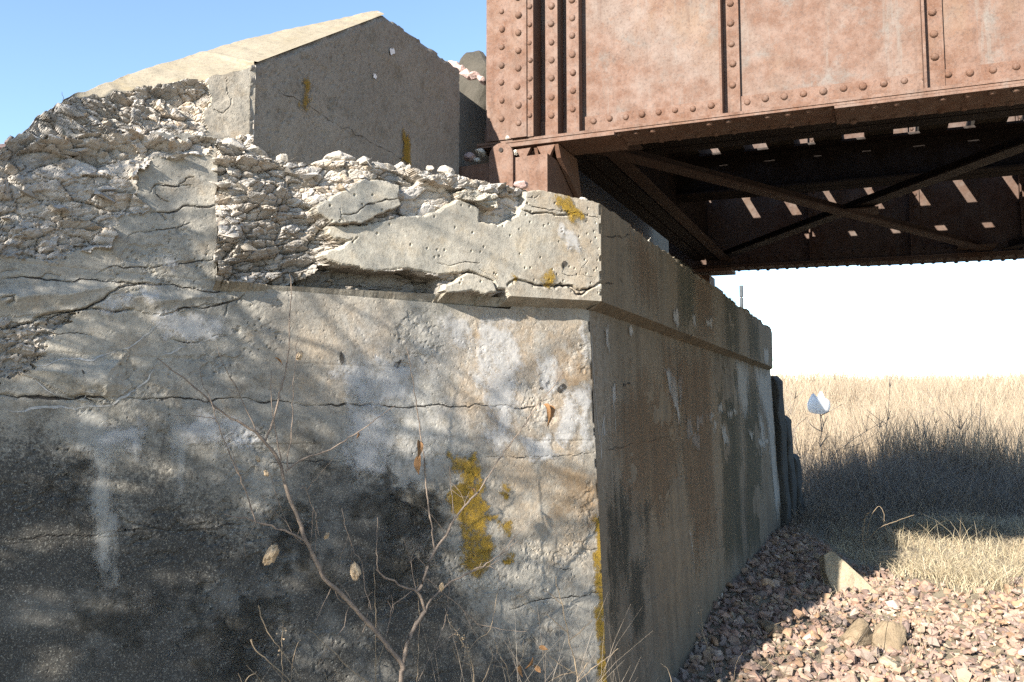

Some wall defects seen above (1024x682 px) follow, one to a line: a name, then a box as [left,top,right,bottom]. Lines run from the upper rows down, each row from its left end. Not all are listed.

spalling [0,312,78,379]
crack [131,177,214,235]
spalling [0,78,527,297]
crack [0,259,530,412]
crack [509,265,623,295]
damp [667,349,780,512]
damp [608,485,647,634]